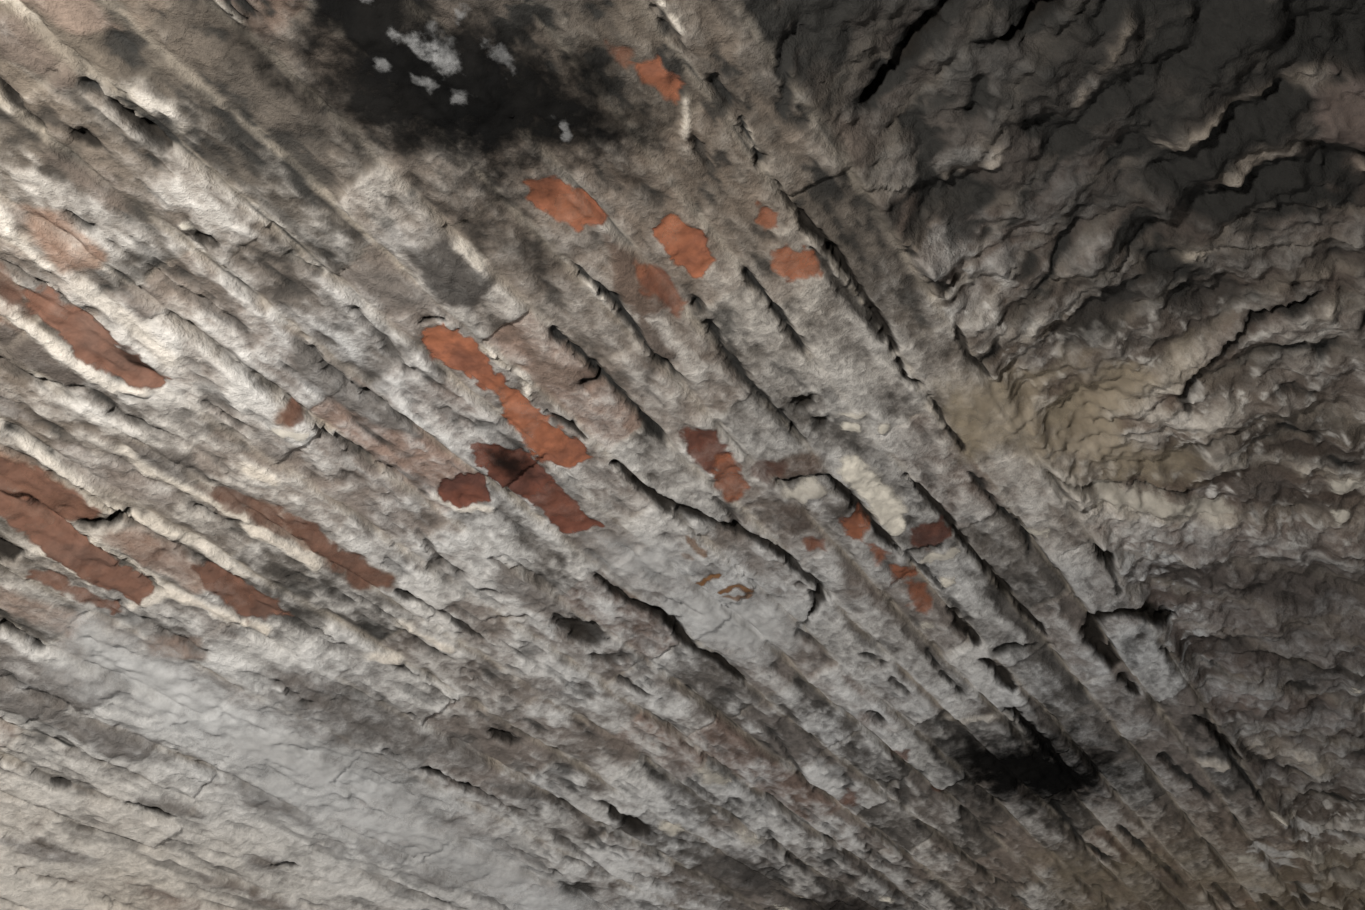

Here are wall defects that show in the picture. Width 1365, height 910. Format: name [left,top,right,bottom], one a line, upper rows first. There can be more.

flaking render [636,57,682,100]
flaking render [523,175,607,232]
flaking render [637,214,715,315]
flaking render [22,286,171,389]
flaking render [422,324,605,534]
crack [546,409,586,438]
flaking render [679,427,750,502]
flaking render [0,457,154,615]
flaking render [192,561,294,618]
flaking render [287,521,392,589]
crack [611,459,825,612]
peeling [839,456,959,612]